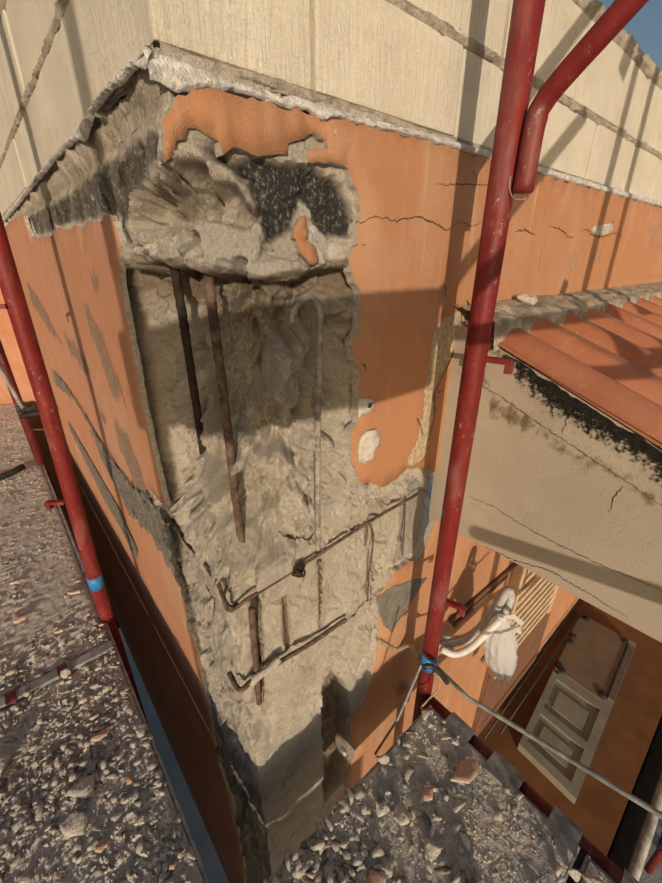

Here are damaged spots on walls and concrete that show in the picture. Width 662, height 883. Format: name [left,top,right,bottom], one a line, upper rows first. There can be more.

crack [352,215,481,247]
crack [515,222,623,238]
spalling [122,150,381,576]
crack [483,386,660,512]
leakage [491,345,662,483]
peeling [373,577,427,632]
crack [484,546,628,618]
crack [468,496,662,591]
spalling [320,669,352,805]
spalling [421,785,433,803]